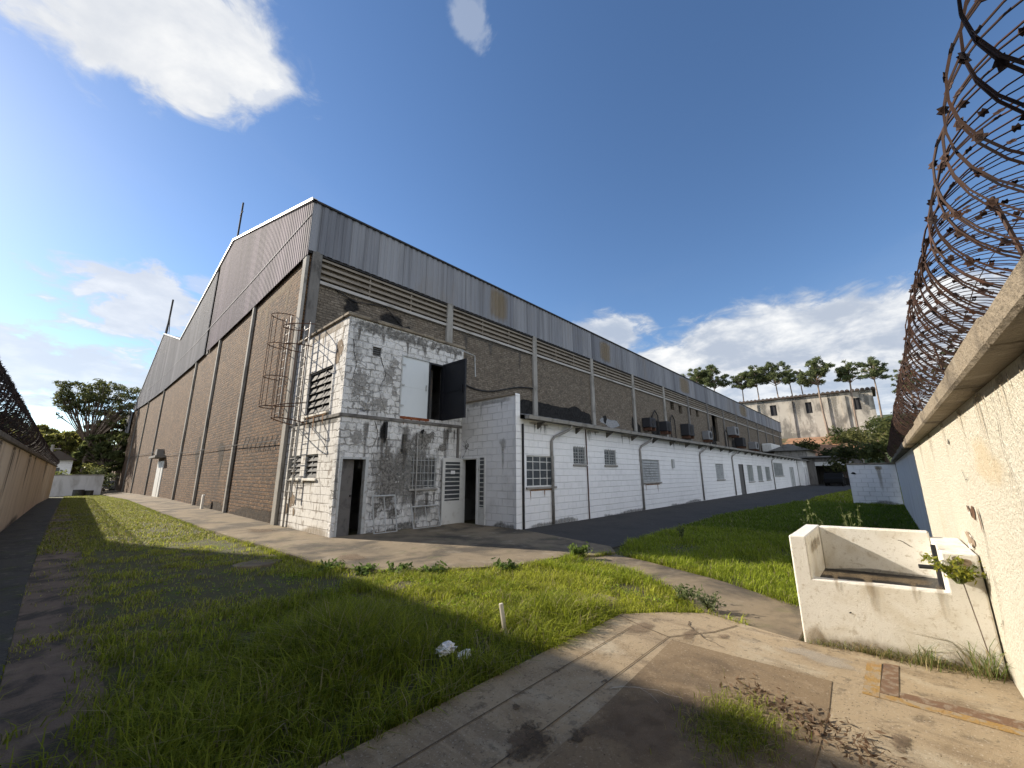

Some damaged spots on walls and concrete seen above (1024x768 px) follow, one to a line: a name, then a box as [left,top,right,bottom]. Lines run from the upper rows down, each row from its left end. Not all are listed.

peeling [334,339,399,414]
peeling [370,425,446,519]